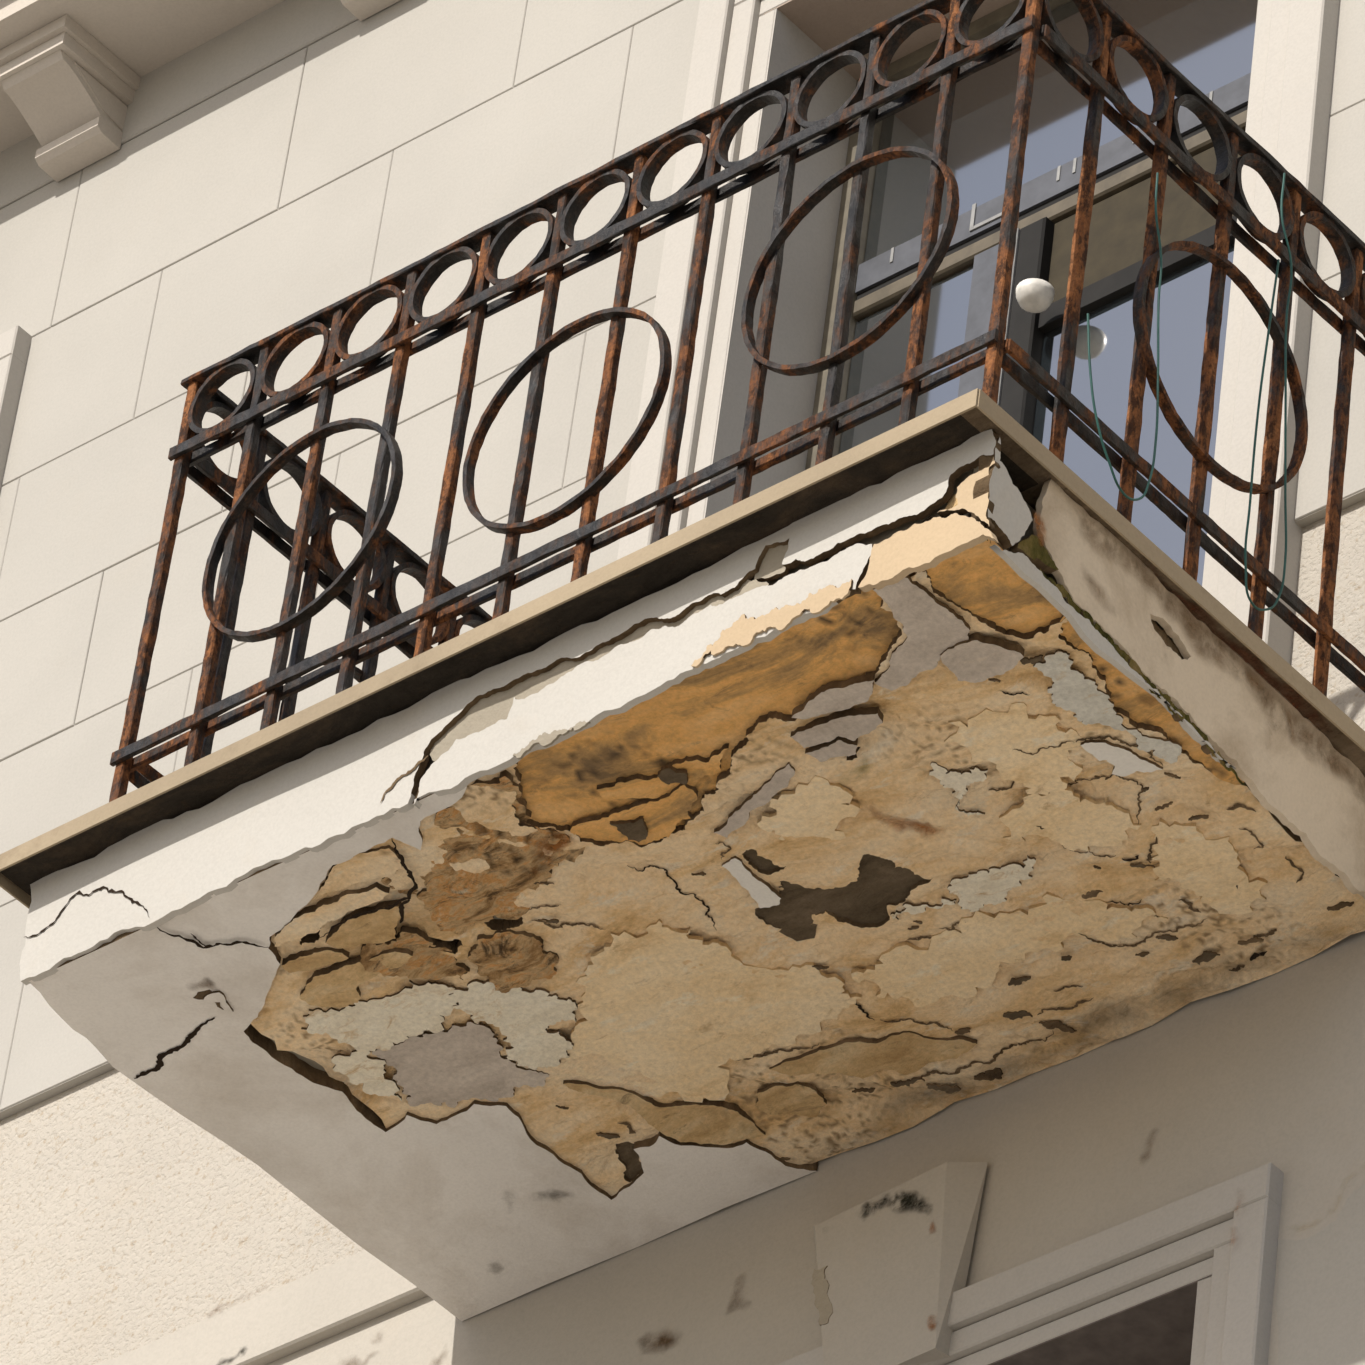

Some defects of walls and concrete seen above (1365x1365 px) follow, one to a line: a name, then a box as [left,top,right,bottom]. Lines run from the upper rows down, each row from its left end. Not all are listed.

crack [922,514,988,529]
rust [1155,575,1327,729]
crack [380,755,428,803]
spalling [251,525,1365,1196]
crack [25,886,268,949]
crack [134,1018,215,1079]